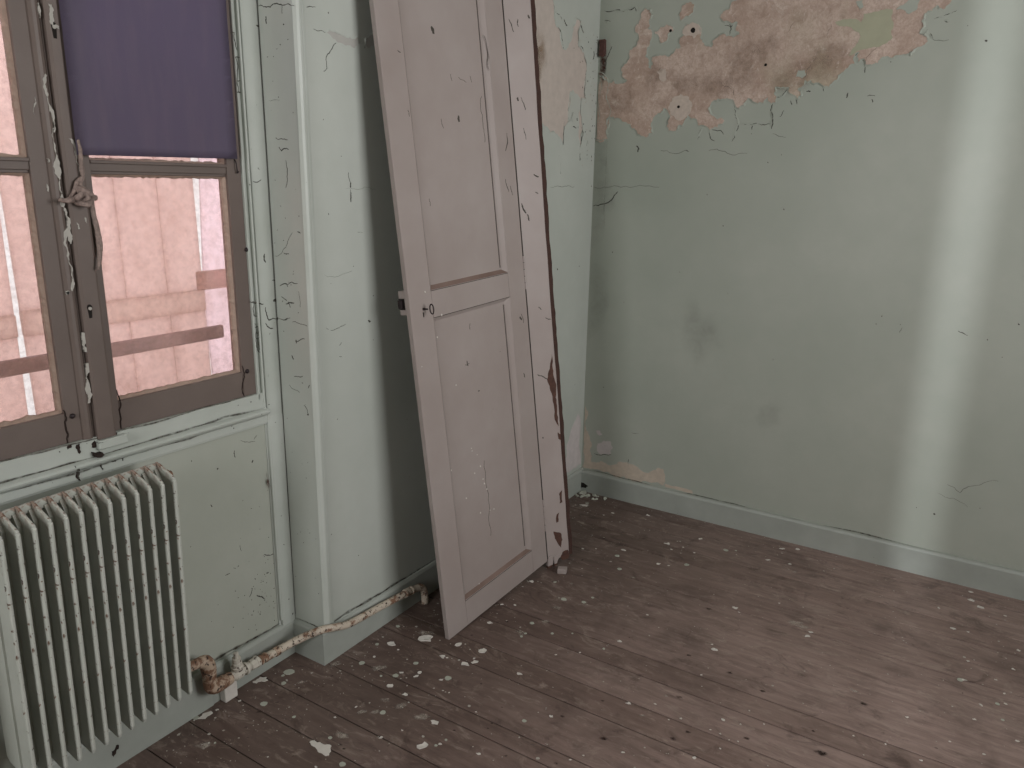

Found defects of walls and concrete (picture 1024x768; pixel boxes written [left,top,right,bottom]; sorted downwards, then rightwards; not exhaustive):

peeling [37,3,59,29]
peeling [535,0,953,161]
crack [637,49,875,155]
peeling [33,74,87,295]
crack [225,0,371,603]
peeling [80,332,92,403]
peeling [547,358,581,473]
peeling [553,491,569,560]